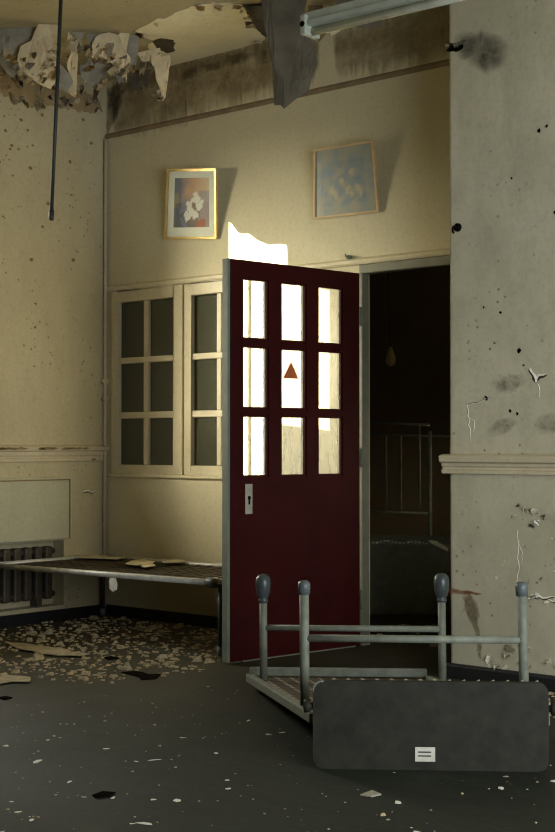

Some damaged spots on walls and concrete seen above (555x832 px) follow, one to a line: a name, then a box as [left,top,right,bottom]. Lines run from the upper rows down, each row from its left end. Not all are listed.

peeling [0,0,354,121]
damp [108,42,272,126]
peeling [516,503,549,529]